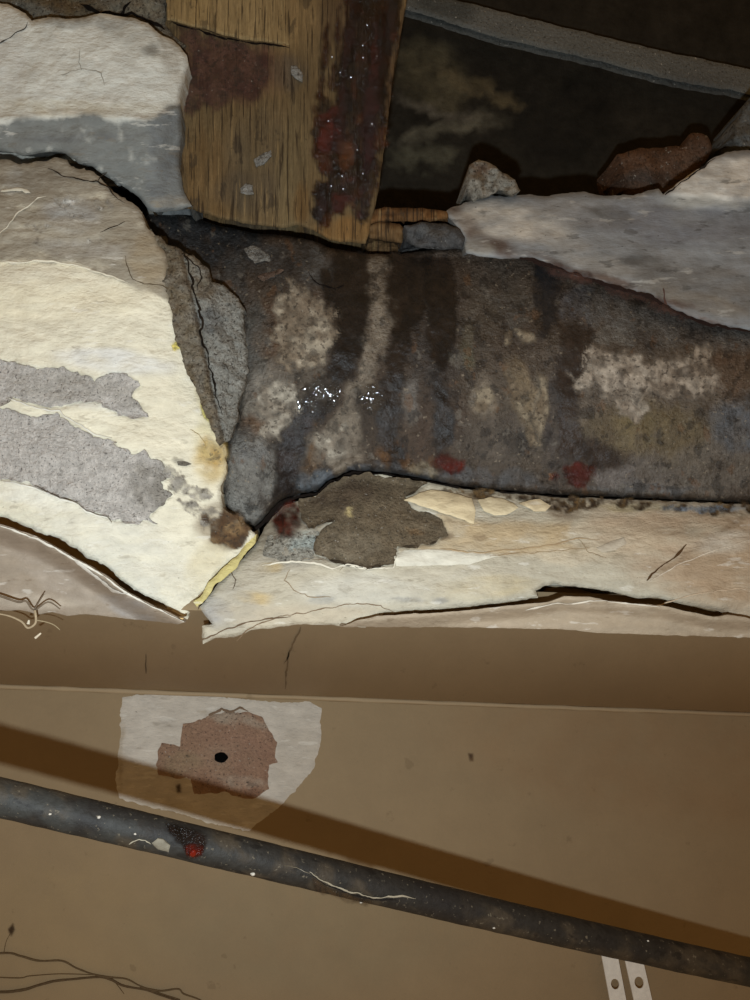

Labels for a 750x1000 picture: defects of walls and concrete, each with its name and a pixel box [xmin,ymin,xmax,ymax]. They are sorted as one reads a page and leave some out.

corrosion [311,0,401,227]
spalling [0,359,191,525]
crack [125,244,229,415]
damp [250,381,343,496]
damp [270,254,370,382]
damp [377,254,457,460]
damp [505,266,719,467]
crack [0,517,119,579]
spalling [262,472,594,570]
crack [180,471,747,619]
crack [200,558,391,689]
spalling [156,707,278,799]